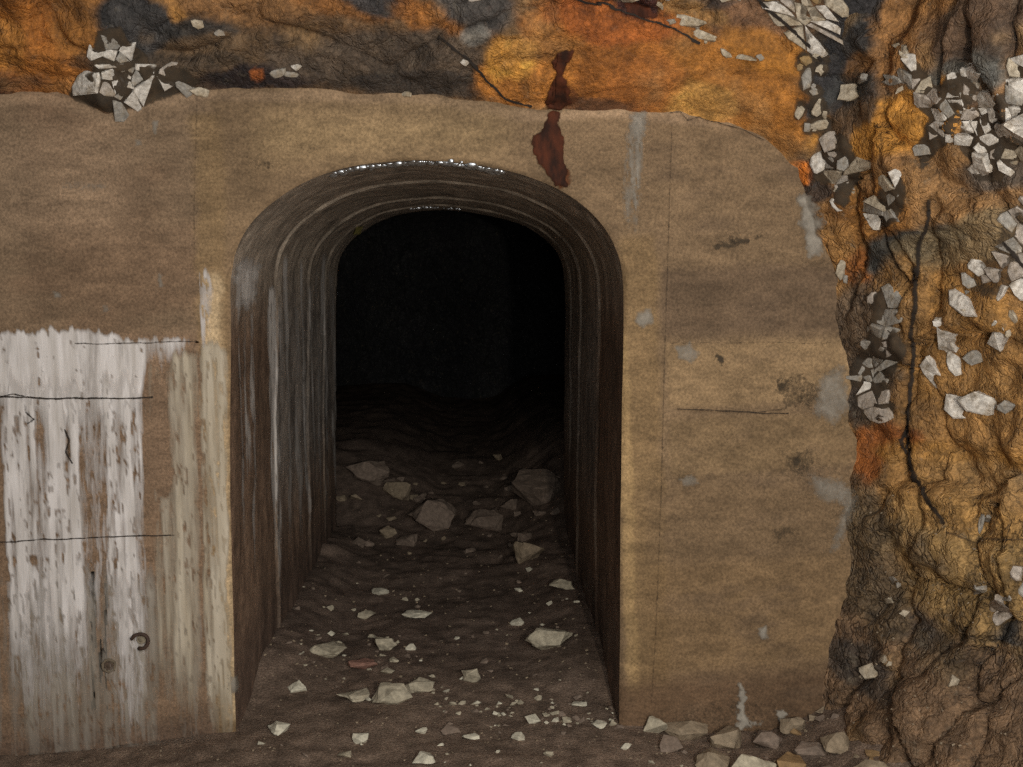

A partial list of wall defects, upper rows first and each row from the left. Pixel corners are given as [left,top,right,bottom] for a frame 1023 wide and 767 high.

rust [531,50,576,188]
water stain [0,270,232,747]